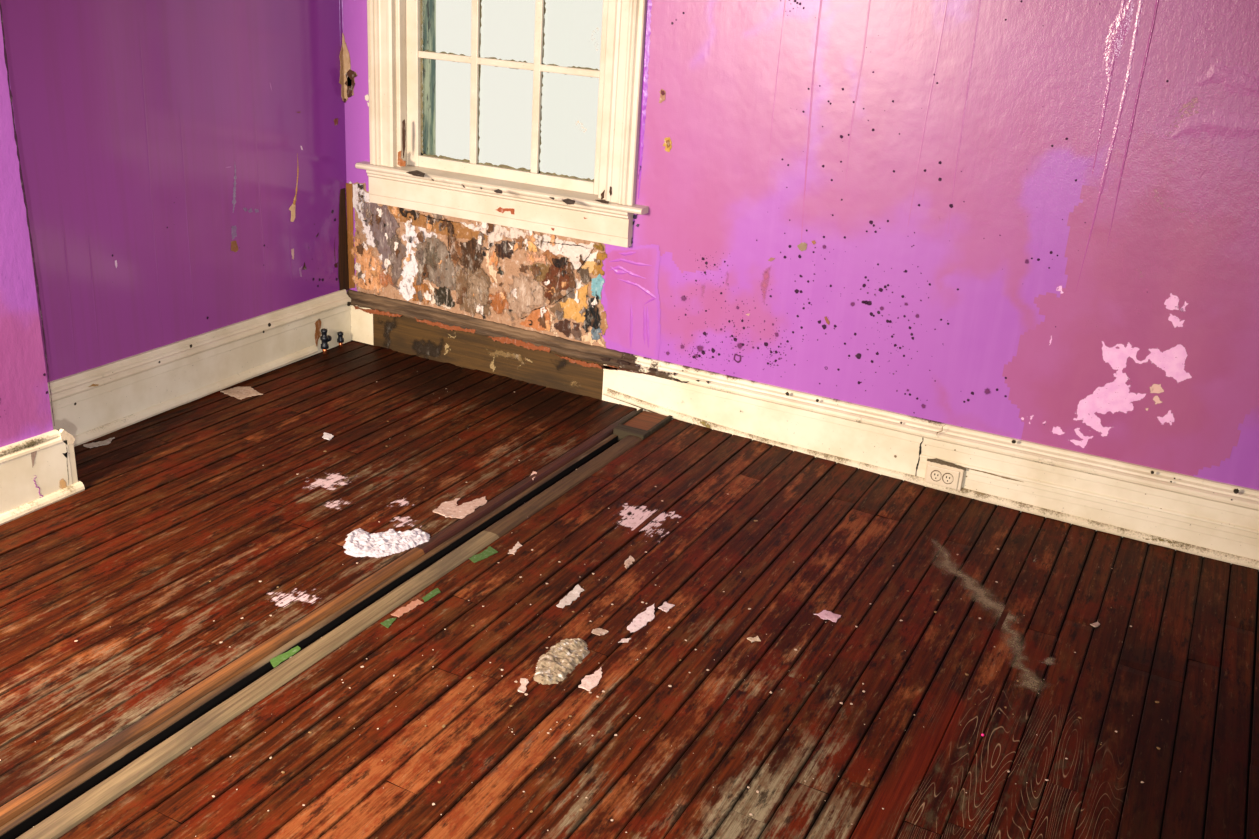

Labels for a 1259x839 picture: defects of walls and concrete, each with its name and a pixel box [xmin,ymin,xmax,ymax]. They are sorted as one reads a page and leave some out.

peeling [339,33,370,107]
damp [0,273,53,467]
peeling [412,334,456,359]
spalling [349,181,608,348]
peeling [486,349,533,372]
damp [630,0,1259,479]
peeling [1021,341,1192,448]
peeling [1164,293,1189,328]